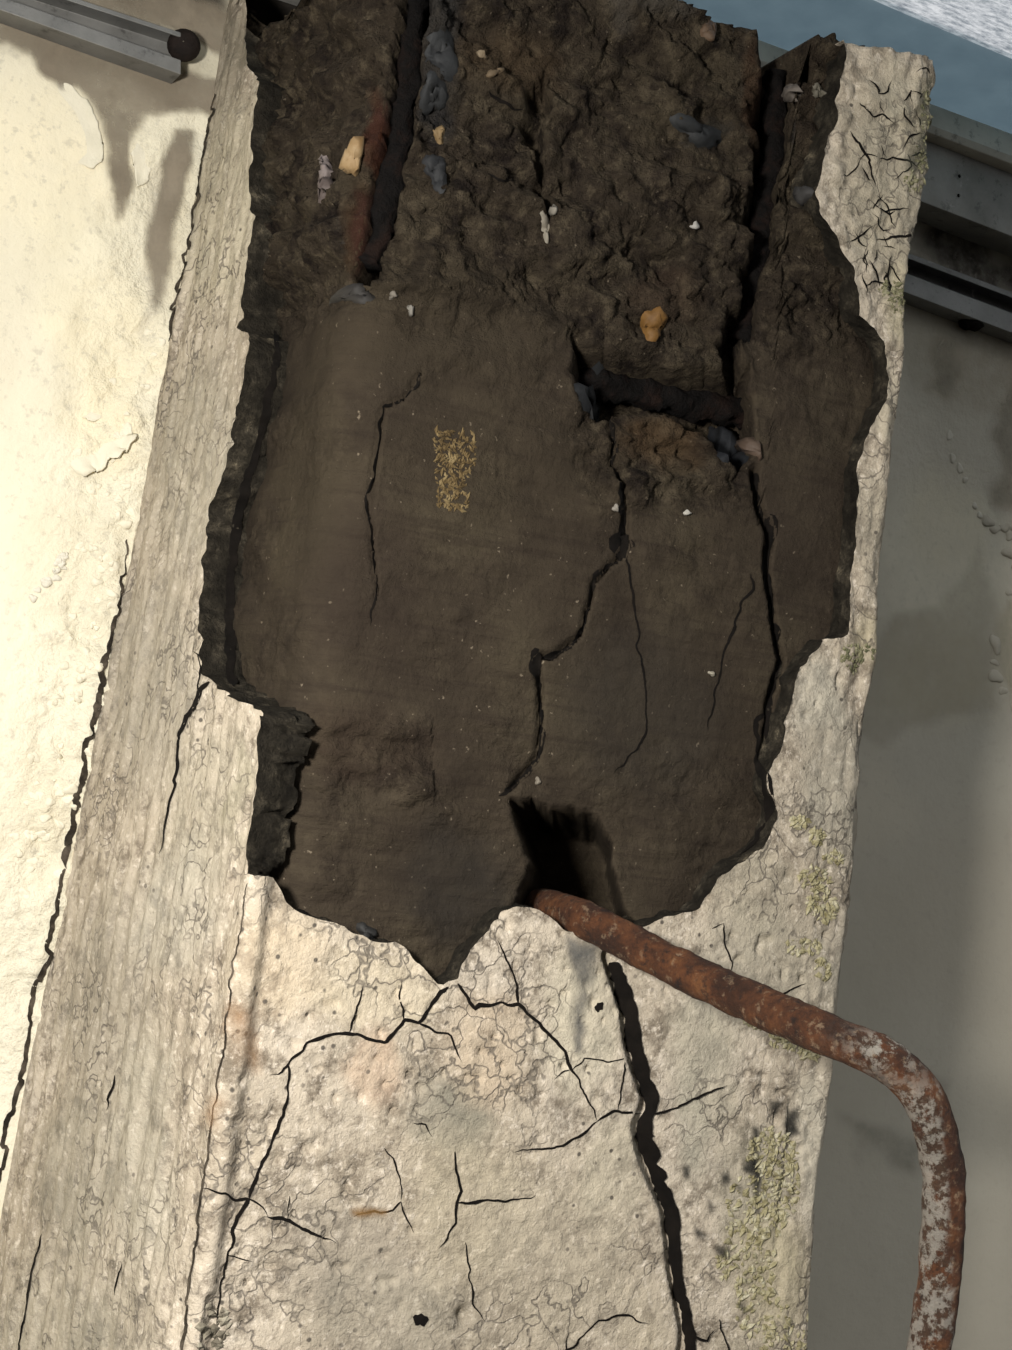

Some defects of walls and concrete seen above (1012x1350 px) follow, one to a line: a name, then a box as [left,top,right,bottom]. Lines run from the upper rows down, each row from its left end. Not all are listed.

leakage [0,23,215,212]
leakage [82,0,227,53]
leakage [146,131,192,294]
crack [489,91,524,111]
crack [844,67,930,292]
crack [364,372,420,625]
spalling [198,0,889,985]
crack [499,420,648,796]
crack [707,473,781,855]
crack [0,539,129,1182]
crack [180,885,733,1350]
crack [18,1234,42,1350]